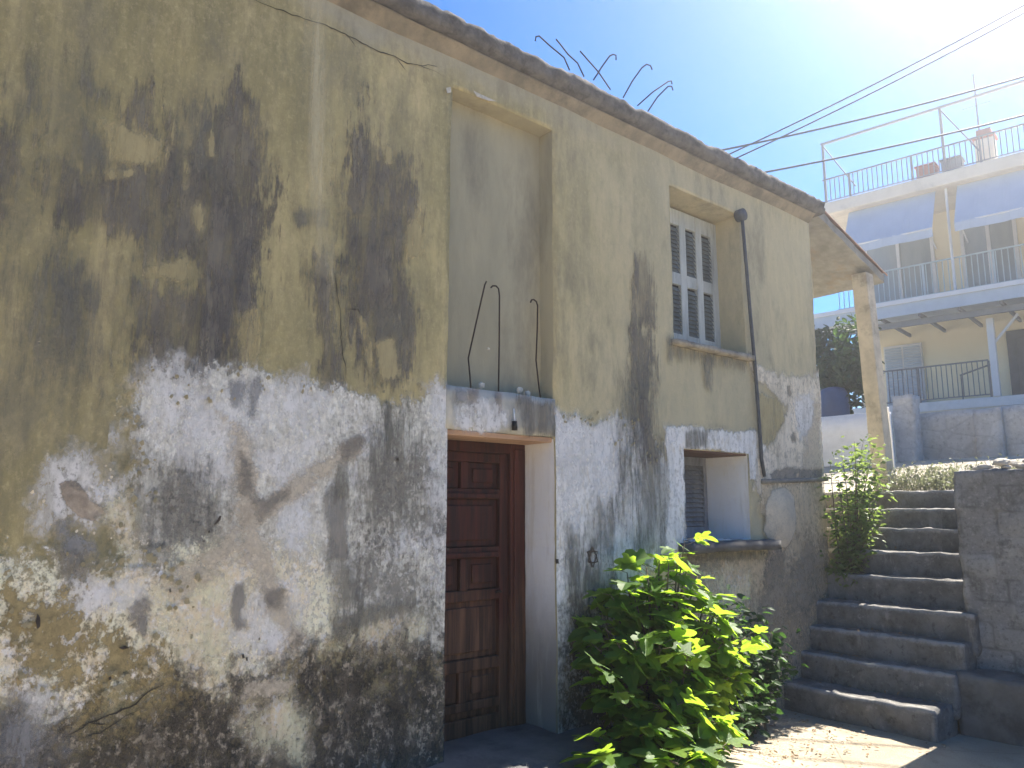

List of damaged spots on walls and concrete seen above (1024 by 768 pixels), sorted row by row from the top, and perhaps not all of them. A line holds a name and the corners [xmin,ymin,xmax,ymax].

crack [256,0,441,75]
water stain [0,65,280,416]
water stain [305,123,422,392]
peeling [0,355,507,761]
water stain [323,402,446,640]
water stain [569,253,746,617]
peeling [555,361,829,734]
water stain [142,677,257,768]
water stain [297,642,445,768]